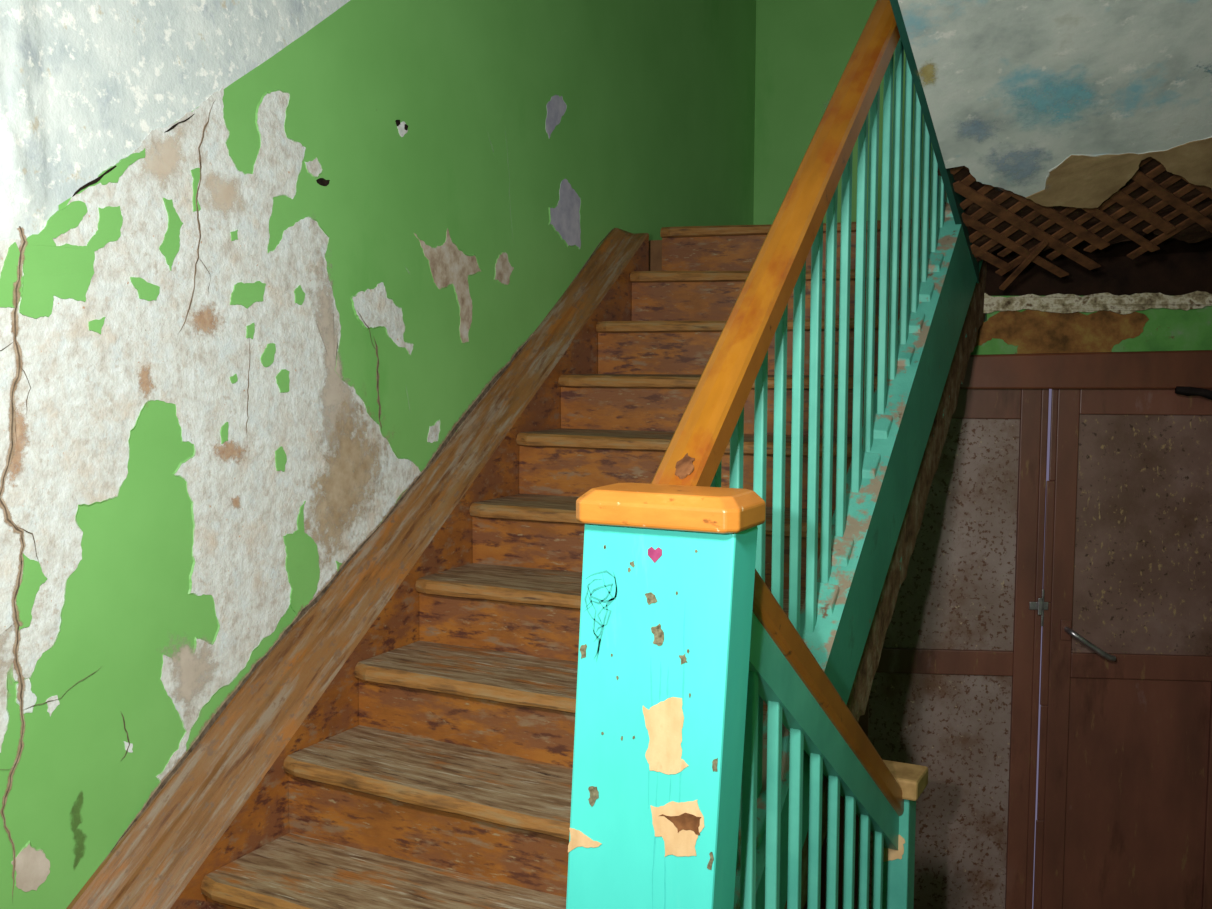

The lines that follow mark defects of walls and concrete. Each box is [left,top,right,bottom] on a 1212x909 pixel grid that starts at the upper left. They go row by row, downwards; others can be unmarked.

peeling [545,94,567,138]
crack [72,166,117,197]
crack [165,102,214,331]
peeling [548,178,581,250]
peeling [413,228,514,344]
peeling [0,86,421,784]
spalling [846,136,1212,722]
crack [0,226,102,896]
peeling [11,840,50,893]
spalling [784,776,828,909]
peeling [883,835,905,862]